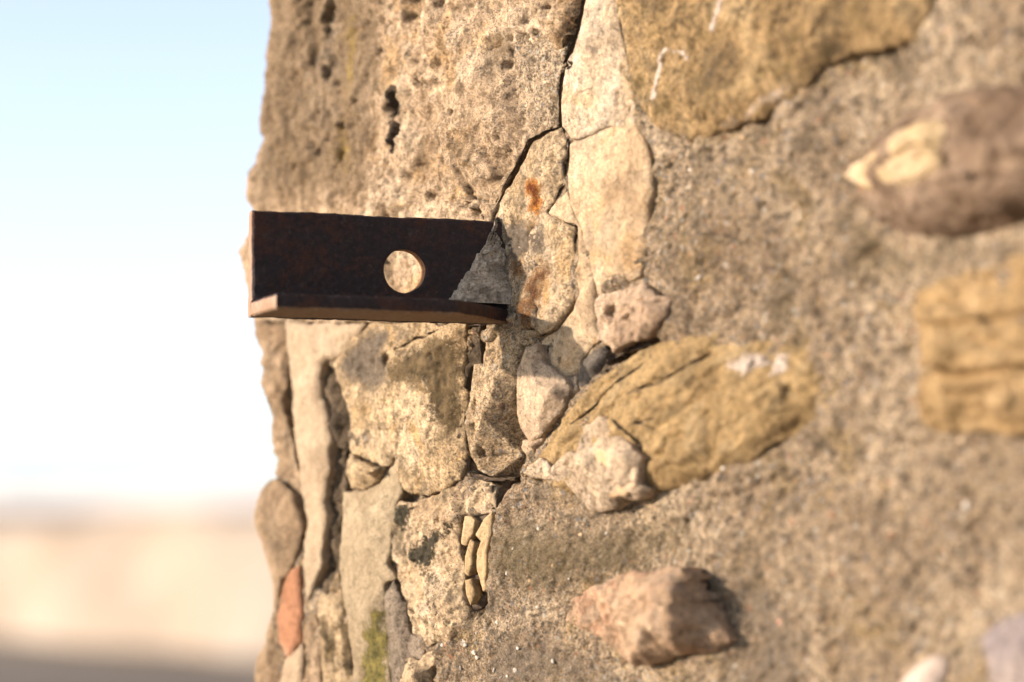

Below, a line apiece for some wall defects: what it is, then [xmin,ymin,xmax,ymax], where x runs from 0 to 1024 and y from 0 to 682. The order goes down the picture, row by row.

crack [465,0,586,220]
rust [524,178,543,227]